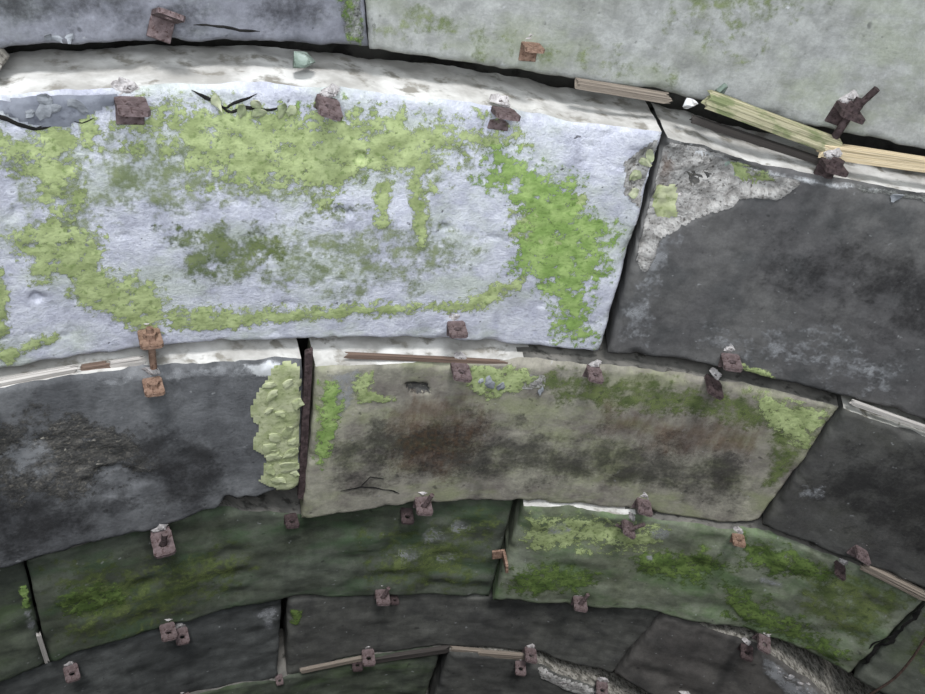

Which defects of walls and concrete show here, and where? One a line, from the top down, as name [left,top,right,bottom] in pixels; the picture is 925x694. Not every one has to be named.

spalling [338,0,364,46]
spalling [624,140,800,272]
leakage [346,426,588,474]